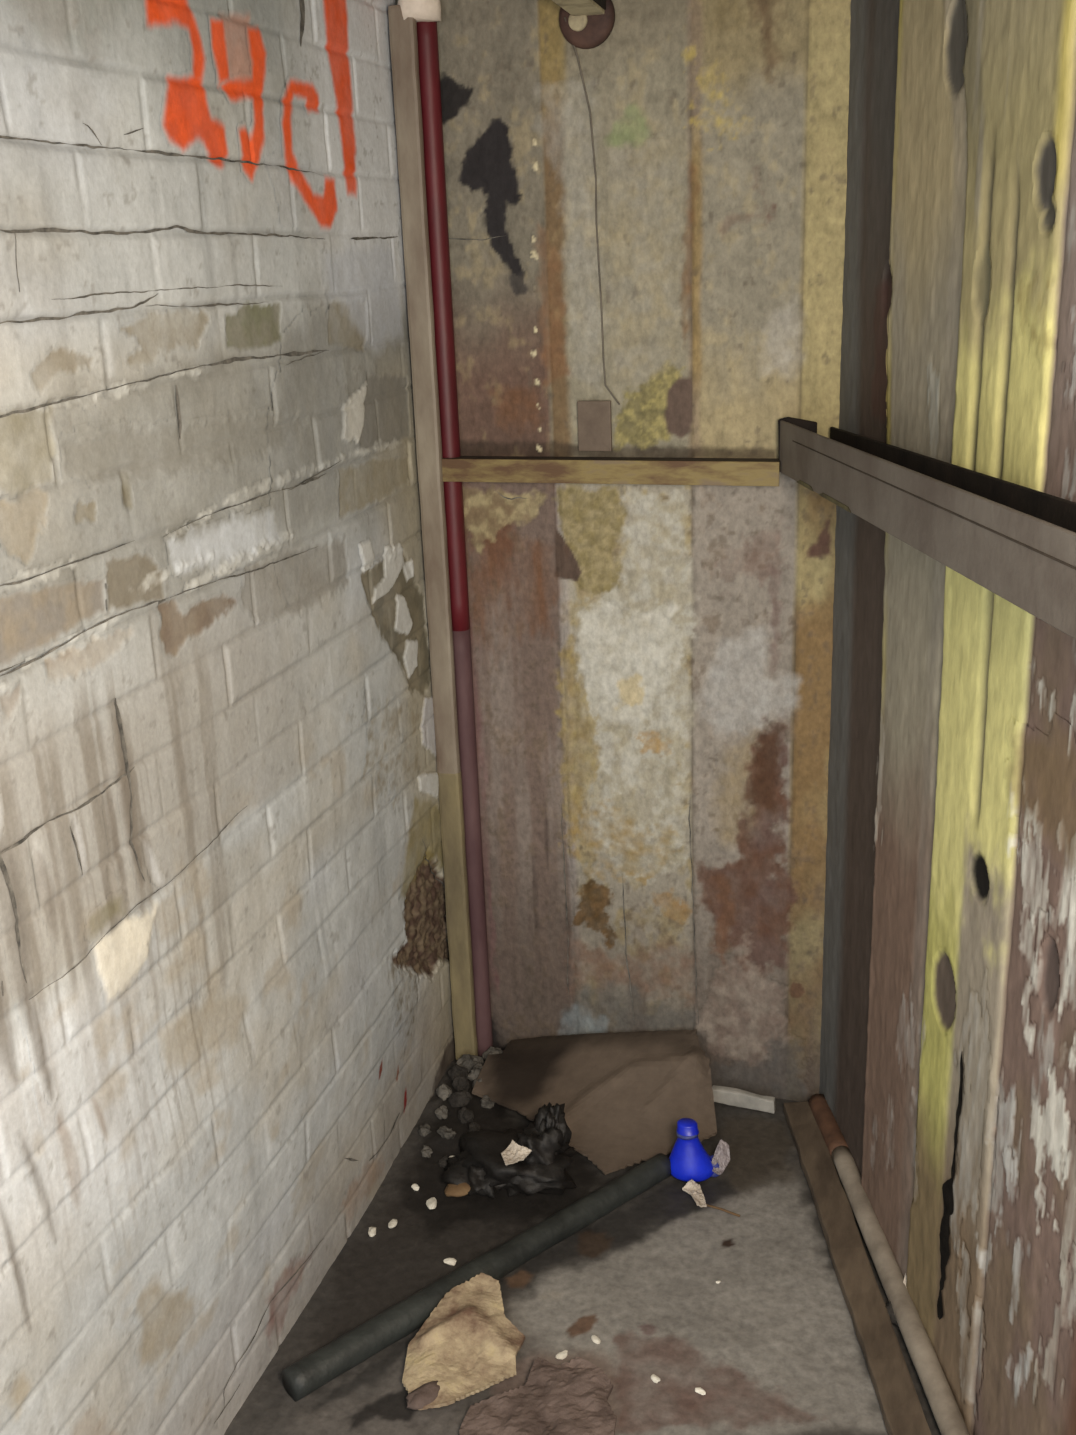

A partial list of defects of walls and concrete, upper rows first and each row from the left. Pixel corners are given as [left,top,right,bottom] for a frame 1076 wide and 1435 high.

crack [0,225,398,324]
peeling [0,531,439,811]
corrosion [465,527,571,671]
peeling [1026,655,1076,732]
water stain [0,1194,35,1337]
water stain [0,793,84,1249]
crack [0,698,247,1000]
water stain [84,697,166,1009]
spalling [386,861,450,1058]
corrosion [551,706,807,1000]
crack [937,1053,964,1320]
peeling [949,799,1076,1420]